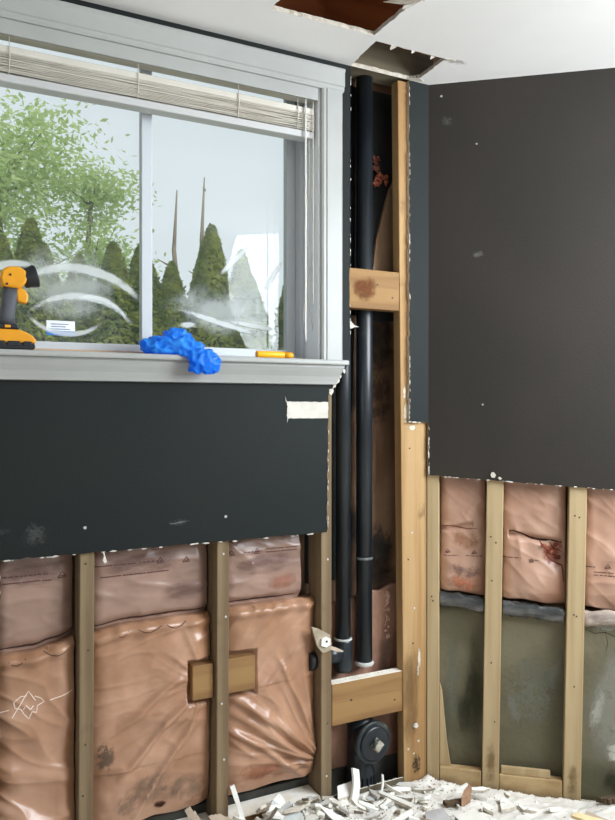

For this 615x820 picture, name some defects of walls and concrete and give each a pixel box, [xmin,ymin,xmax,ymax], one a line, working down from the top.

leakage [372,322,392,368]
leakage [372,381,390,420]
leakage [372,527,391,589]
leakage [460,671,480,726]
leakage [590,658,615,760]